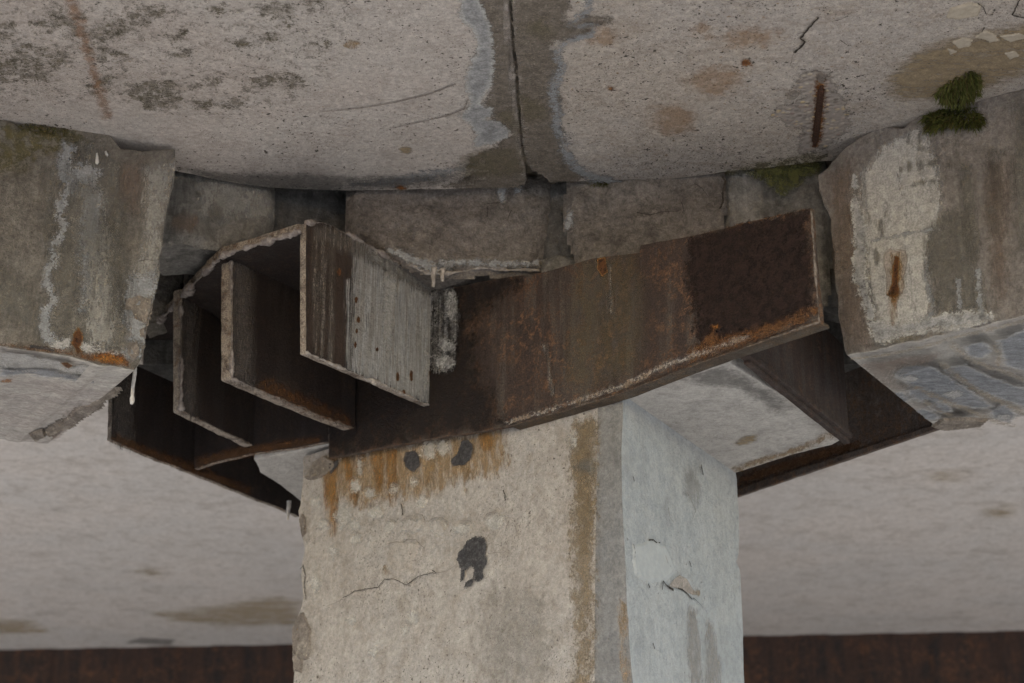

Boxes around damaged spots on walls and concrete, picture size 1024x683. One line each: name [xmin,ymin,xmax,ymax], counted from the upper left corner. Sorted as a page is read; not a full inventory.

crack [790,12,852,69]
water stain [351,0,622,202]
water stain [0,140,274,388]
corrosion [883,248,908,308]
water stain [834,103,1024,427]
corrosion [0,327,129,369]
corrosion [323,429,509,535]
crack [333,568,451,604]
peeling [632,539,702,606]